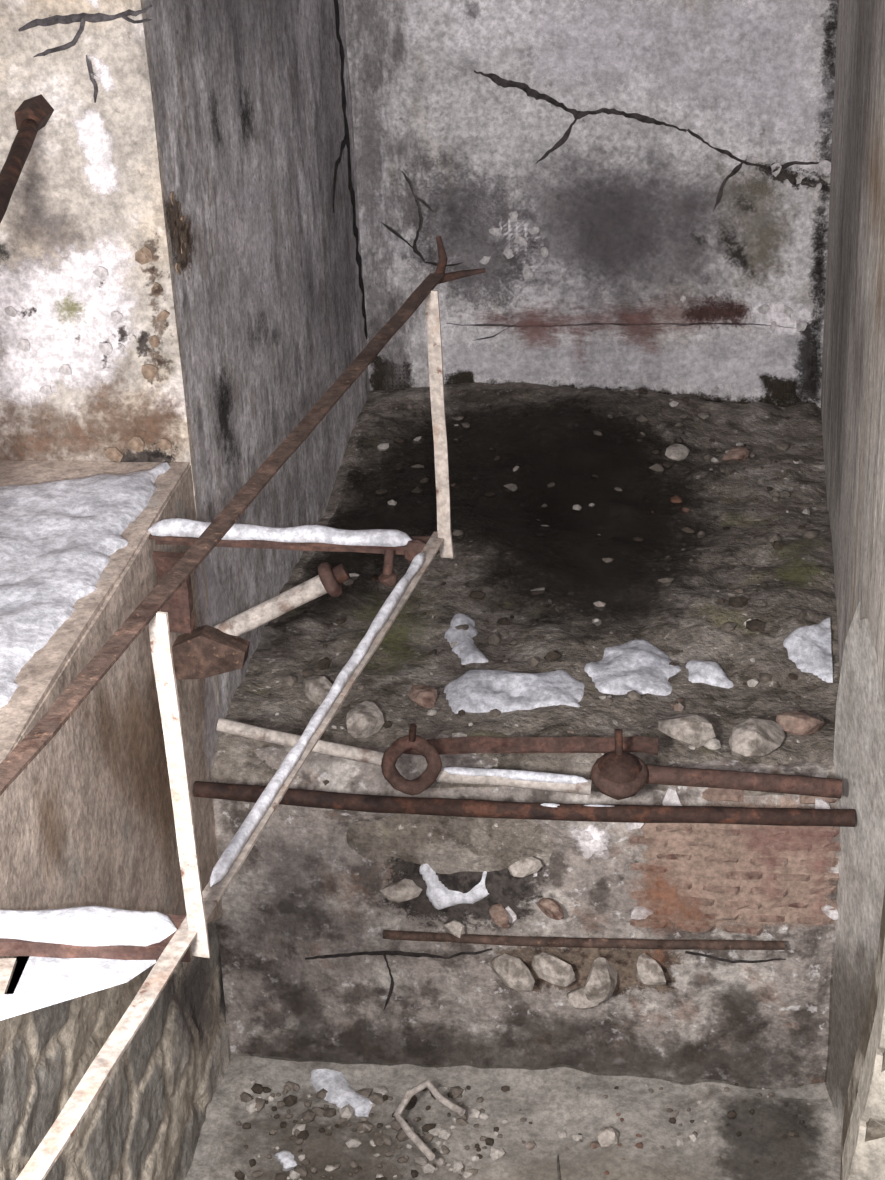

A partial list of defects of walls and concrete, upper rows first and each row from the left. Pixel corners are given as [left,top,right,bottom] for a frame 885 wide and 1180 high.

crack [18,5,152,103]
crack [333,0,461,339]
crack [474,70,830,211]
leakage [722,232,753,275]
corrosion [427,736,658,755]
leakage [250,987,824,1180]